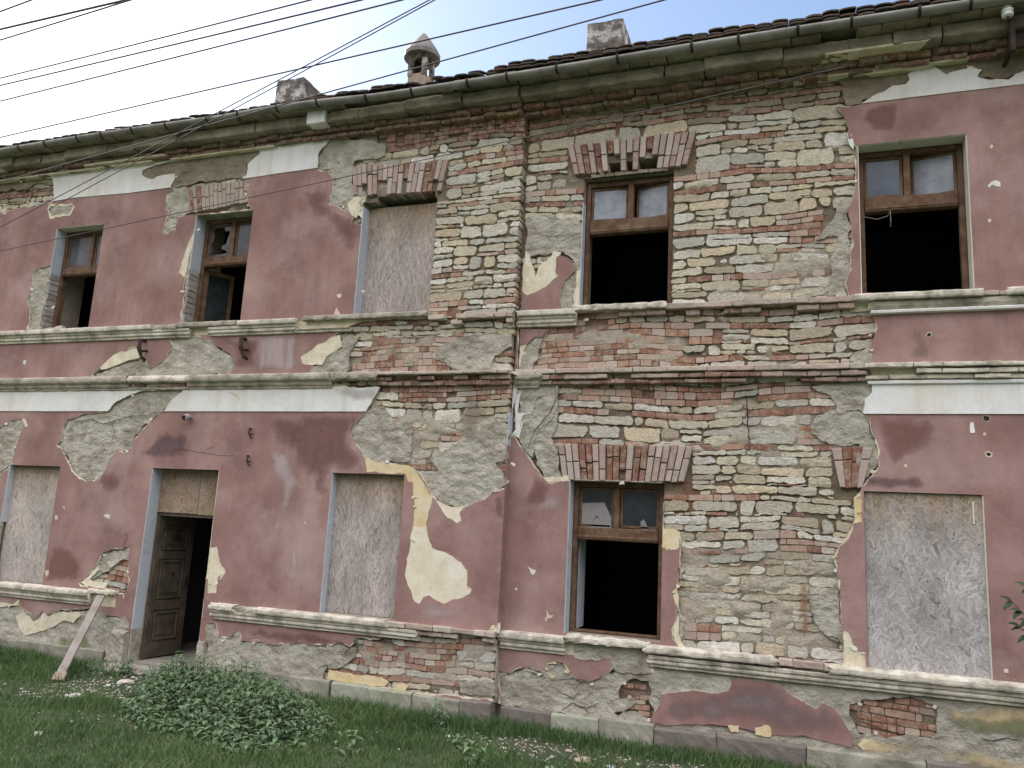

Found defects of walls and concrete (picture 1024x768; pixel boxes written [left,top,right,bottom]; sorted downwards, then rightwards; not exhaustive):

spalling [936,52,1024,80]
spalling [94,334,235,377]
spalling [301,72,911,670]
spalling [59,390,183,481]
spalling [80,547,130,593]
peeling [206,546,226,593]
spalling [0,599,129,650]
spalling [205,623,1024,768]